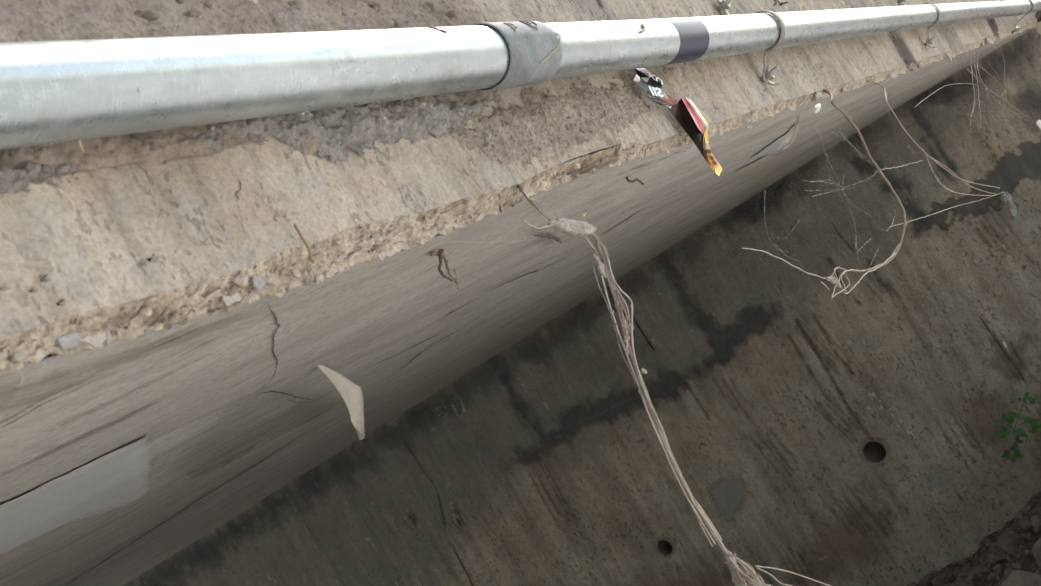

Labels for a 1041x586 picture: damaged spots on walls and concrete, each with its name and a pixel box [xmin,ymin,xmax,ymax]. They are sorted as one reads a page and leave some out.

spalling [703,21,1038,158]
spalling [0,132,693,373]
crack [259,301,311,403]
peeling [317,365,365,440]
leakage [455,254,778,464]